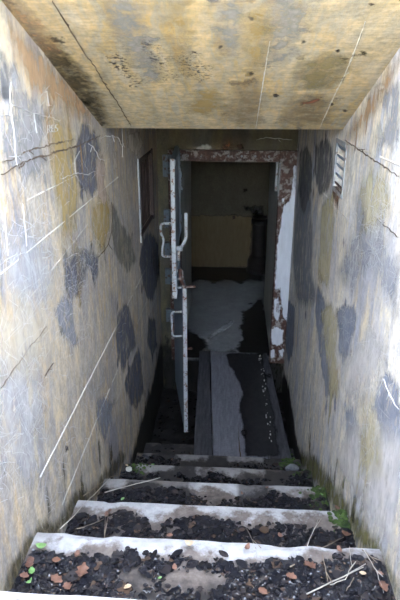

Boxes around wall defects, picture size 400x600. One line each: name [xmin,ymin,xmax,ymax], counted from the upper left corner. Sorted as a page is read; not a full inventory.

crack [1,1,131,179]
leakage [30,34,106,126]
crack [320,23,365,127]
crack [345,140,399,177]